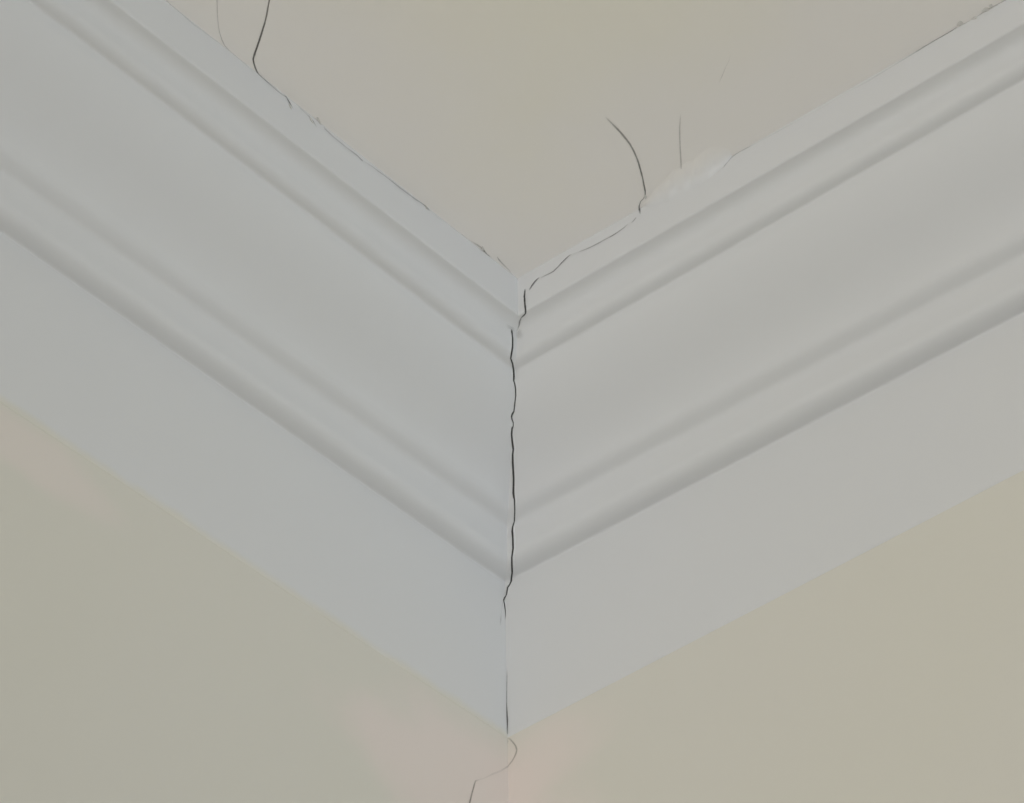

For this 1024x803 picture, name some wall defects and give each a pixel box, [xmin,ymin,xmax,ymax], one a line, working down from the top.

crack [253,0,270,73]
crack [637,159,647,211]
crack [502,258,566,616]